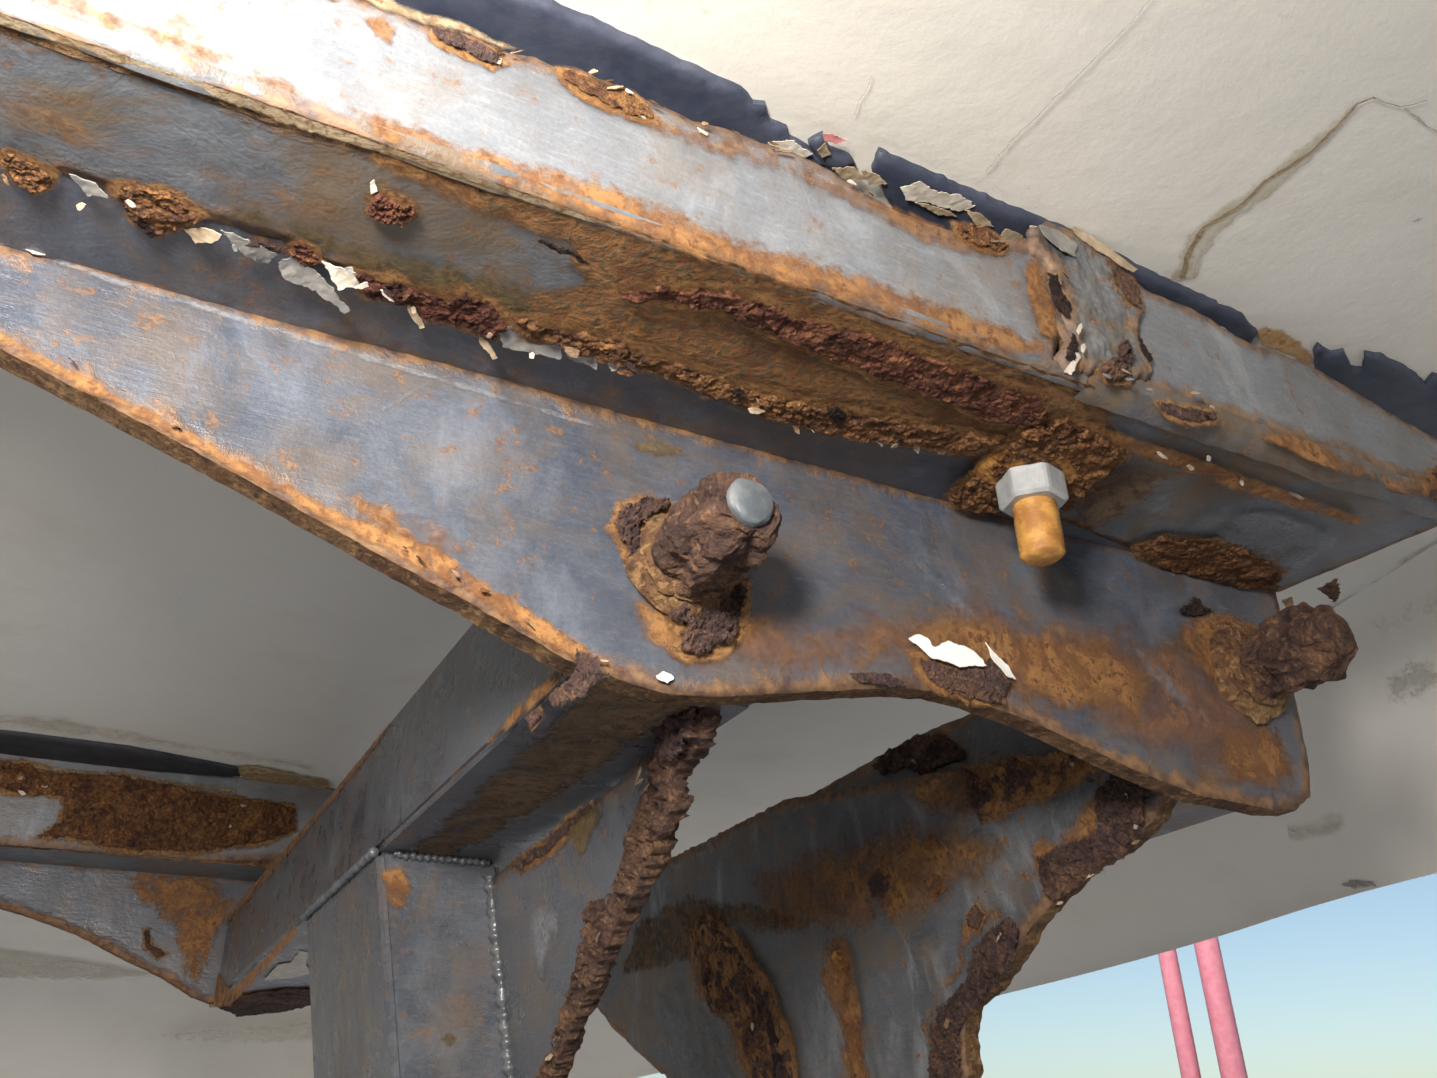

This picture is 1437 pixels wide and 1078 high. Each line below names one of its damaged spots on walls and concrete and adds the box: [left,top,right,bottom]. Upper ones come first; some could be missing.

peeling [768,133,975,217]
crack [1180,97,1437,278]
spalling [279,256,562,360]
corrosion [0,116,1362,525]
corrosion [0,333,620,742]
corrosion [605,493,674,568]
corrosion [638,575,1276,776]
peeling [908,634,1016,680]
corrosion [0,724,391,1017]
corrosion [536,706,799,1078]
corrosion [872,734,1163,905]
corrosion [920,902,1019,1078]